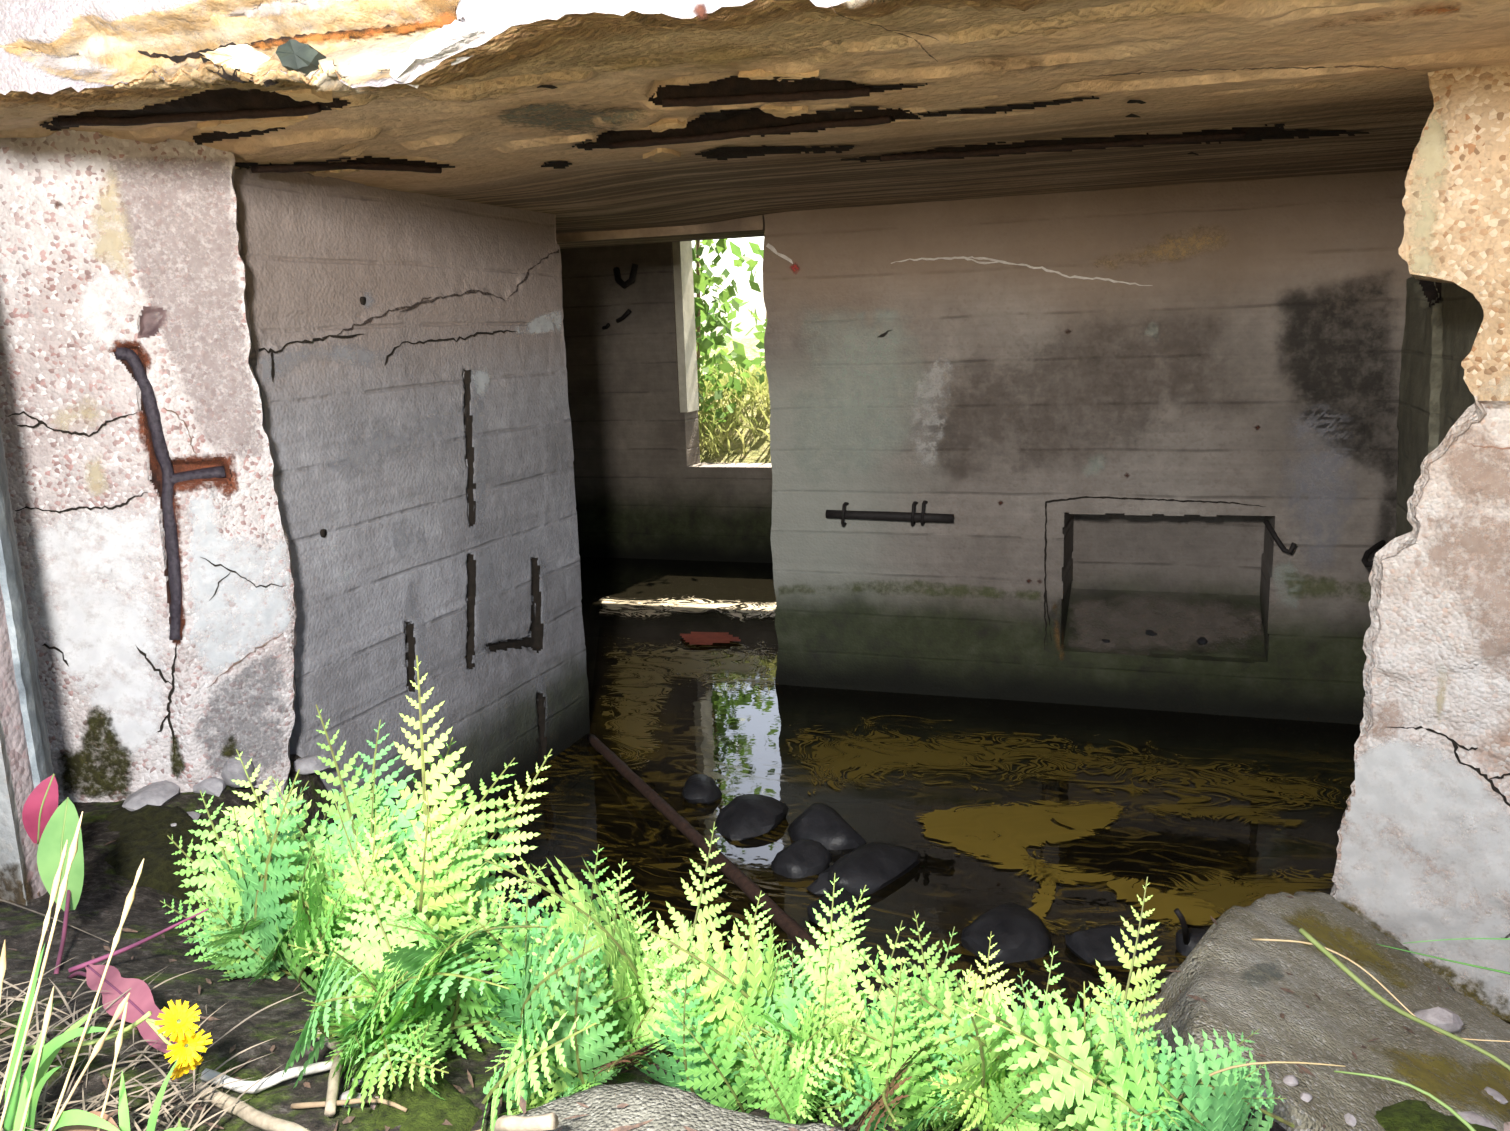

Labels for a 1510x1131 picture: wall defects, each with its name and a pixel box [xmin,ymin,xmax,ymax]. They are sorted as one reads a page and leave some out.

spalling [0,0,486,145]
spalling [541,69,1369,169]
crack [891,256,1152,286]
crack [8,408,197,454]
damp [1282,285,1398,548]
crack [259,249,559,770]
crack [136,633,283,744]
crack [1389,726,1510,806]
peeling [1339,742,1510,1020]
spalling [1261,1075,1312,1102]